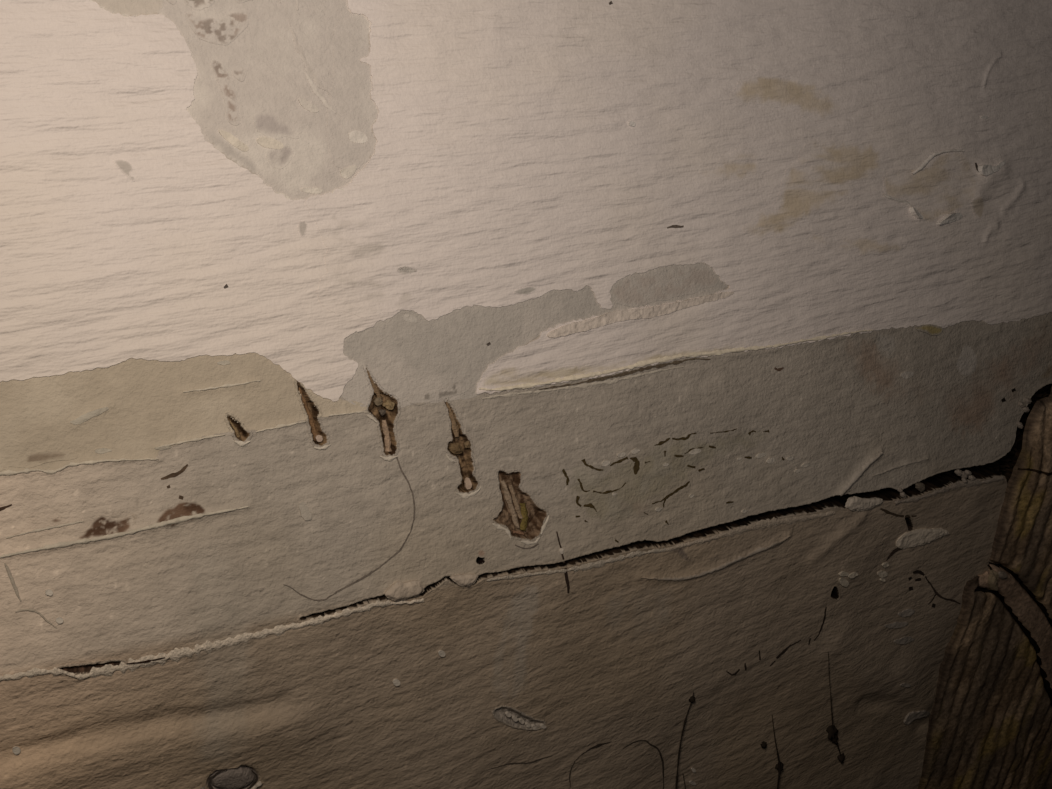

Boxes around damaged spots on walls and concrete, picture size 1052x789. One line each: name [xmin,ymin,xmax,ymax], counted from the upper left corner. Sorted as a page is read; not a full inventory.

peeling [89,0,379,200]
peeling [0,263,734,500]
rust [78,500,206,540]
spalling [491,467,550,545]
crack [0,382,1052,681]
peeling [562,426,810,543]